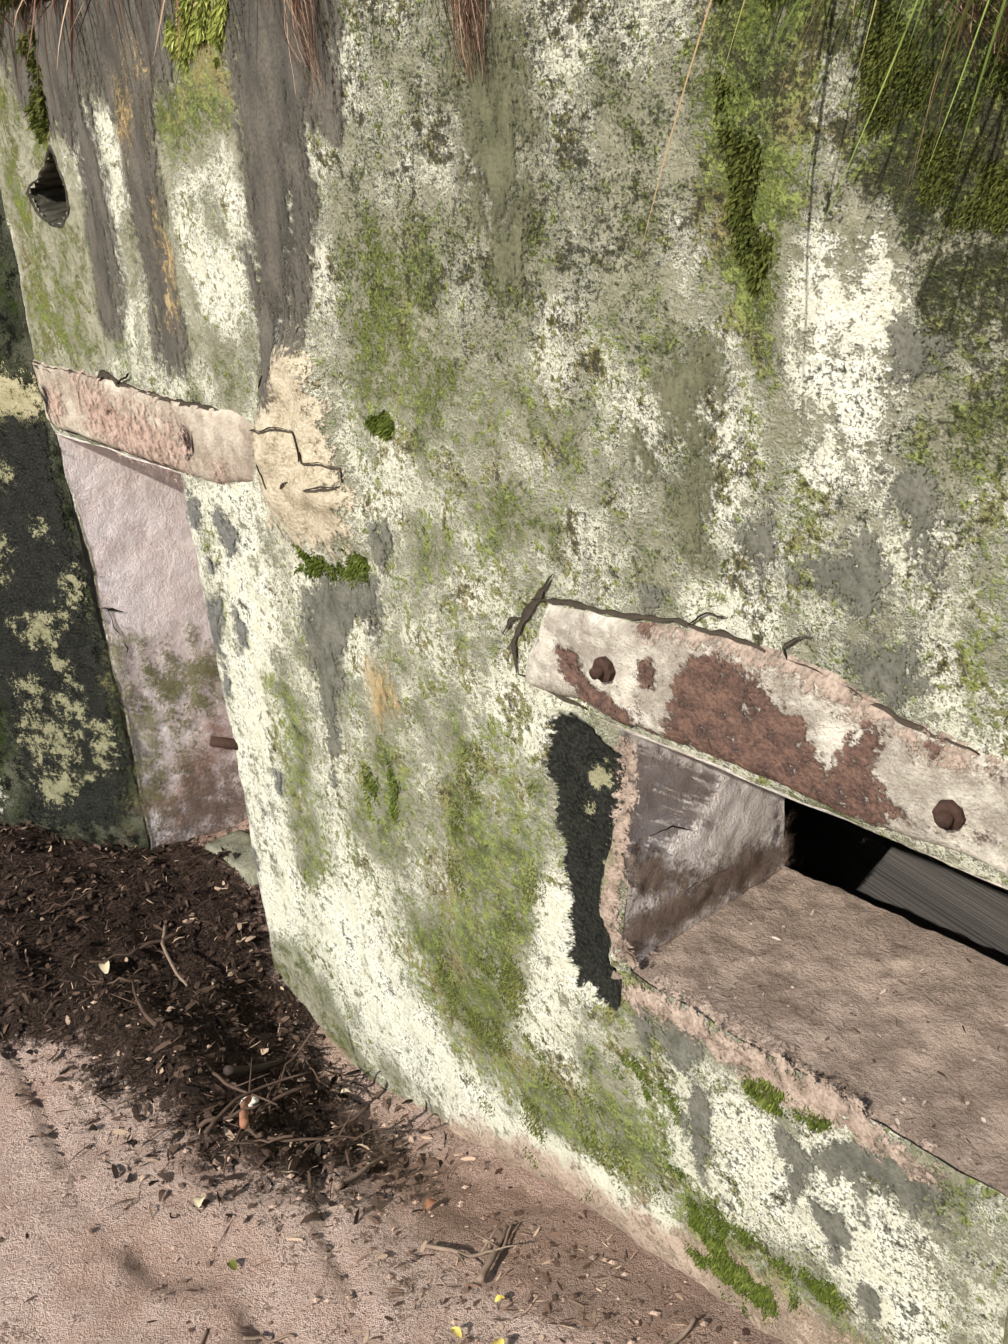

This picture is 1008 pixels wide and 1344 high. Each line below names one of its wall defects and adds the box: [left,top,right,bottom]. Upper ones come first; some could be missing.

damp [0,0,190,382]
damp [212,0,343,418]
corrosion [636,622,655,640]
corrosion [553,643,905,831]
corrosion [923,738,945,766]